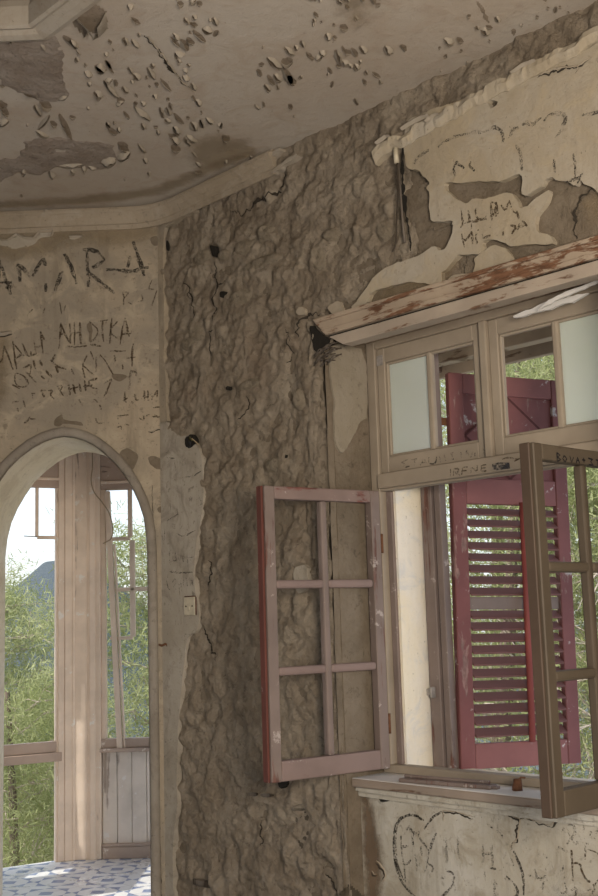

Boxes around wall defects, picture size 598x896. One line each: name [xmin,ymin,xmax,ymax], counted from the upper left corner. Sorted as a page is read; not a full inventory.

peeling [0,0,230,182]
crack [232,174,286,217]
crack [572,188,593,239]
flaking render [150,0,598,896]